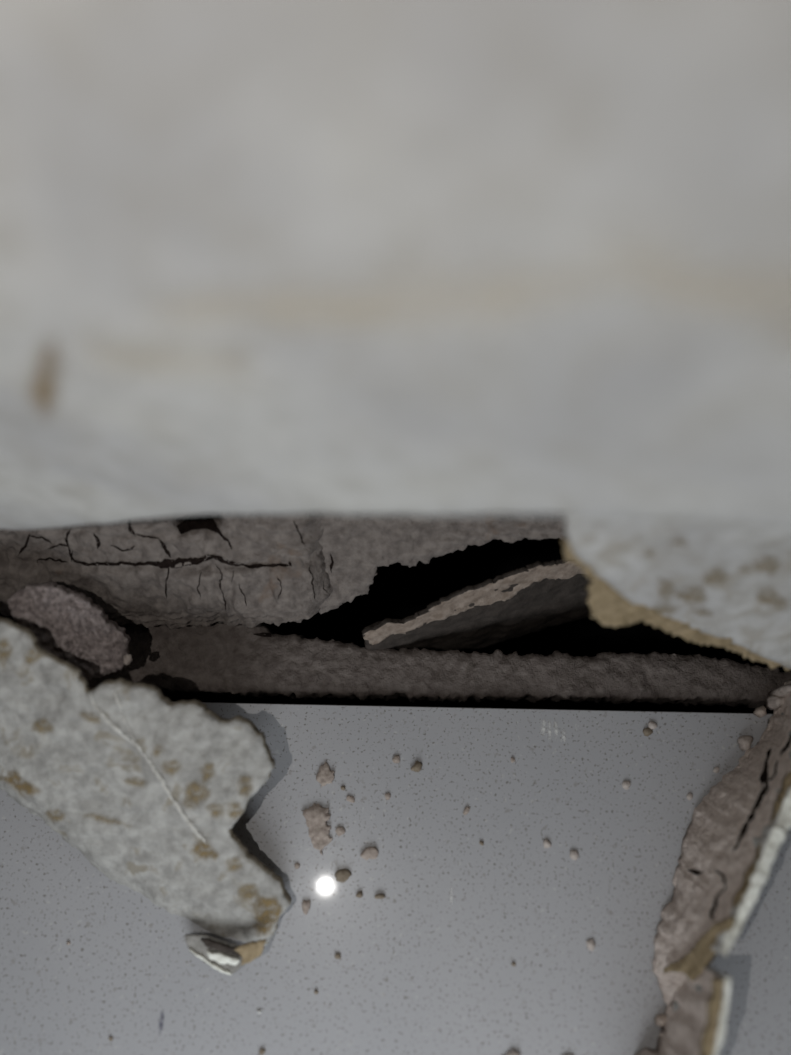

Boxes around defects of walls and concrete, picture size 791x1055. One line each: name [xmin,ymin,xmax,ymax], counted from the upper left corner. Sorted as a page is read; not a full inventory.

crack [19,515,334,611]